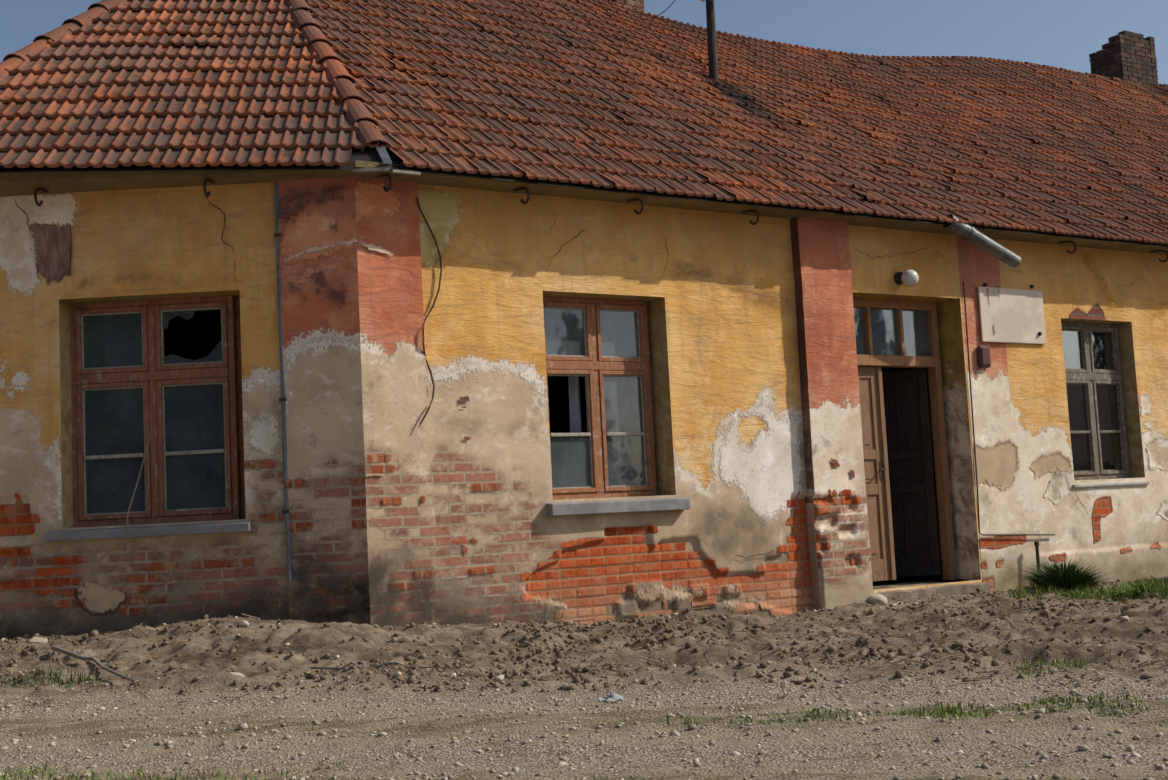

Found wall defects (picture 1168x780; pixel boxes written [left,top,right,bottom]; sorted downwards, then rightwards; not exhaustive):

peeling [0,193,79,297]
crack [207,198,237,282]
peeling [0,327,873,638]
peeling [967,368,1168,591]
water stain [0,619,121,639]
water stain [198,558,512,627]